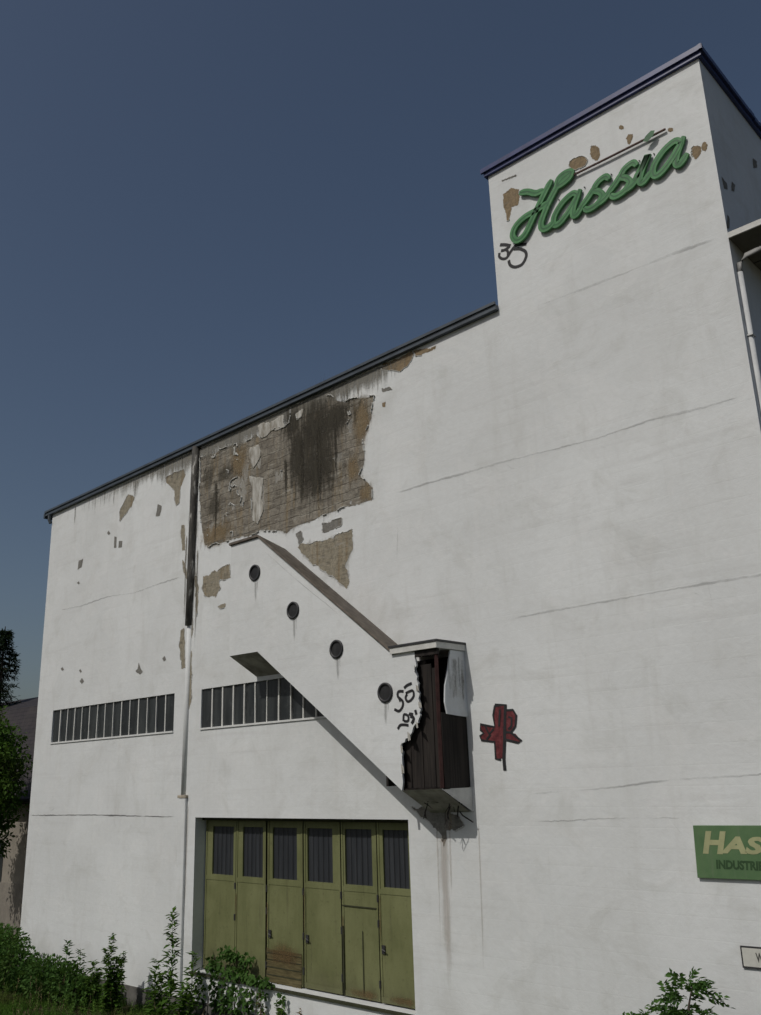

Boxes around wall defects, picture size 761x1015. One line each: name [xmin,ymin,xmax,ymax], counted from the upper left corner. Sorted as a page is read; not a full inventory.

peeling [568,145,600,170]
peeling [691,142,708,159]
peeling [502,175,520,221]
peeling [381,346,436,372]
water stain [113,361,395,537]
peeling [165,469,186,506]
peeling [198,386,392,589]
peeling [119,495,135,521]
peeling [179,525,231,707]